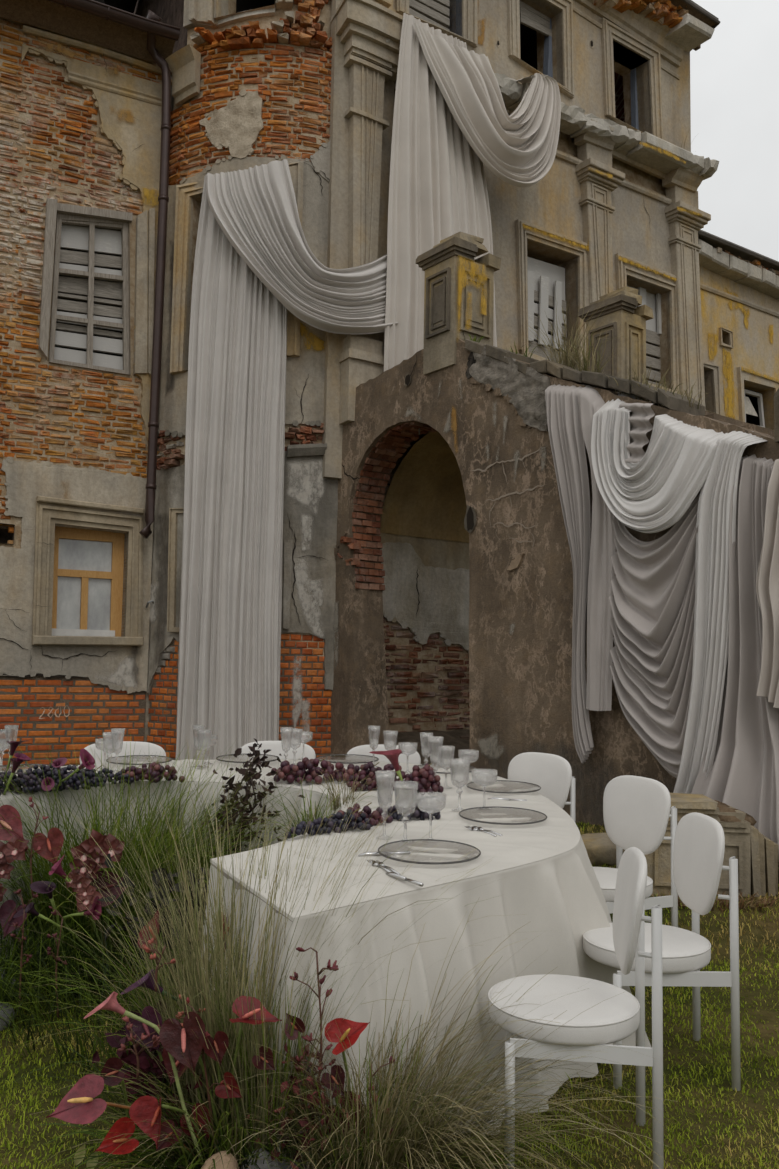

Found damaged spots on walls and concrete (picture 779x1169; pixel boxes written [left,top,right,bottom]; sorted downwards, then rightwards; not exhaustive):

spalling [294,0,332,14]
spalling [169,37,333,186]
spalling [0,17,172,520]
flaking render [334,409,470,732]
crack [0,605,115,667]
flaking render [0,669,88,679]
peeling [108,657,136,694]